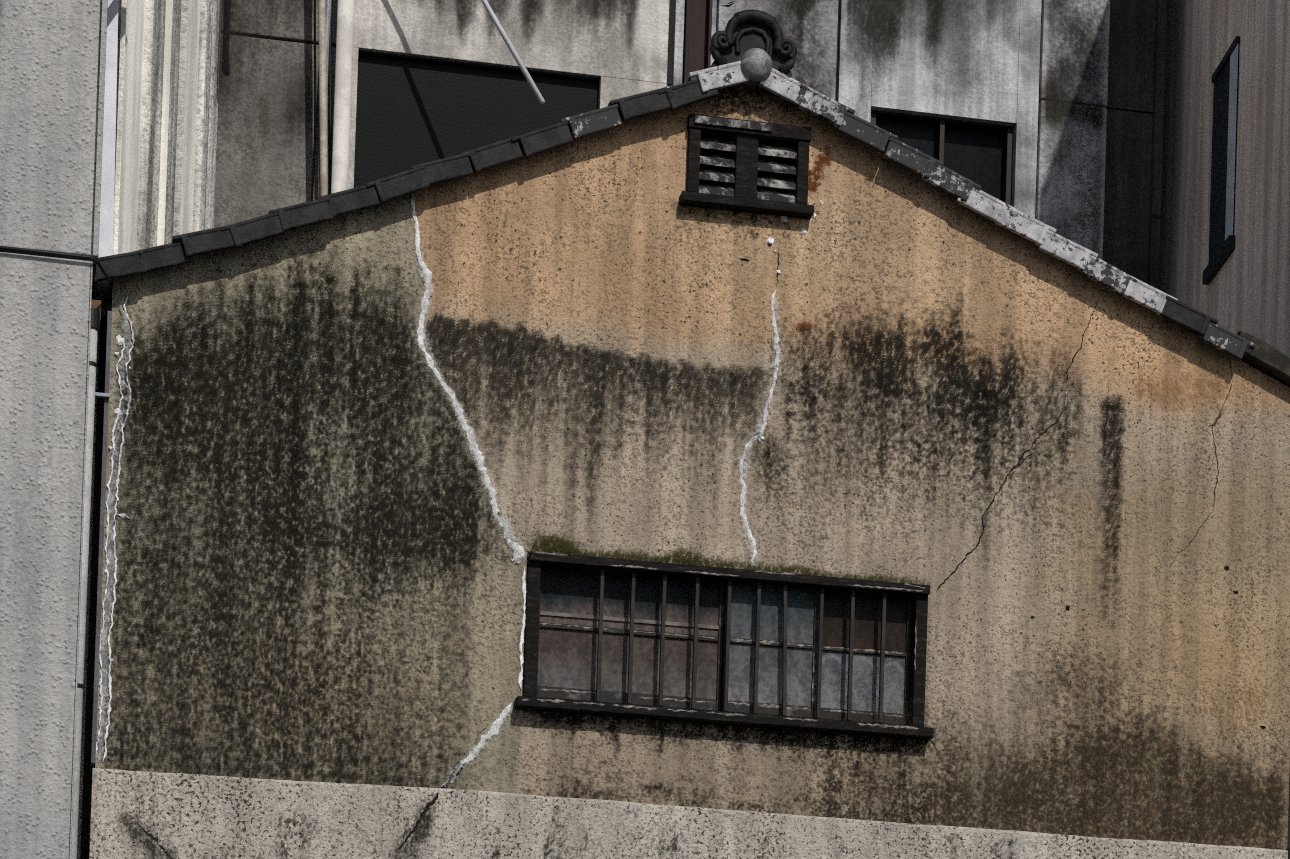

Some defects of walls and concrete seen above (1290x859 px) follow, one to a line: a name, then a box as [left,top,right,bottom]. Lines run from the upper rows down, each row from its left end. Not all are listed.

damp [437,0,505,35]
damp [578,0,637,42]
corrosion [808,144,831,192]
damp [848,0,908,64]
damp [1046,8,1103,126]
crack [96,296,135,763]
crack [410,194,526,788]
damp [106,249,1082,859]
crack [739,253,782,564]
crack [936,299,1099,591]
damp [1099,395,1126,606]
damp [526,664,1284,859]